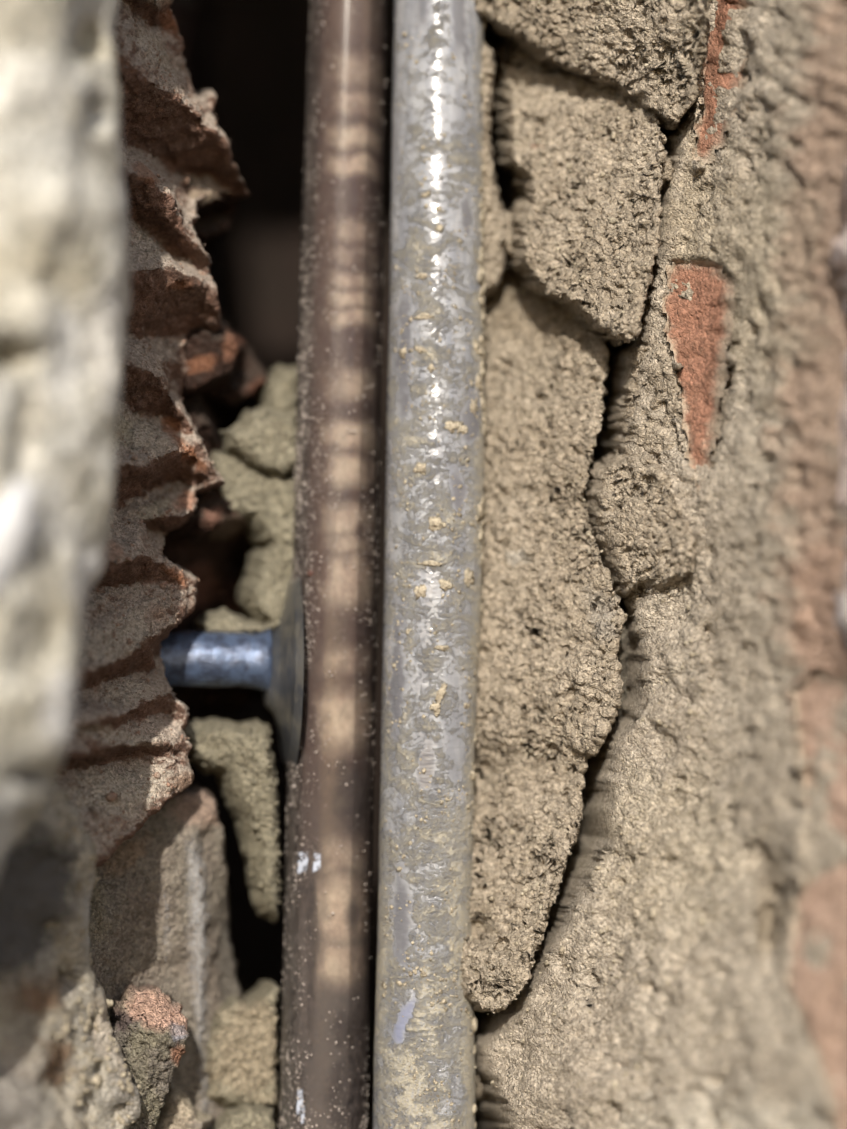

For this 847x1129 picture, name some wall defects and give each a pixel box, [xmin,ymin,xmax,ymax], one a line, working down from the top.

crack [484,32,592,85]
crack [490,102,522,213]
crack [660,117,686,156]
crack [602,340,631,404]
crack [589,434,604,467]
crack [475,1100,483,1129]